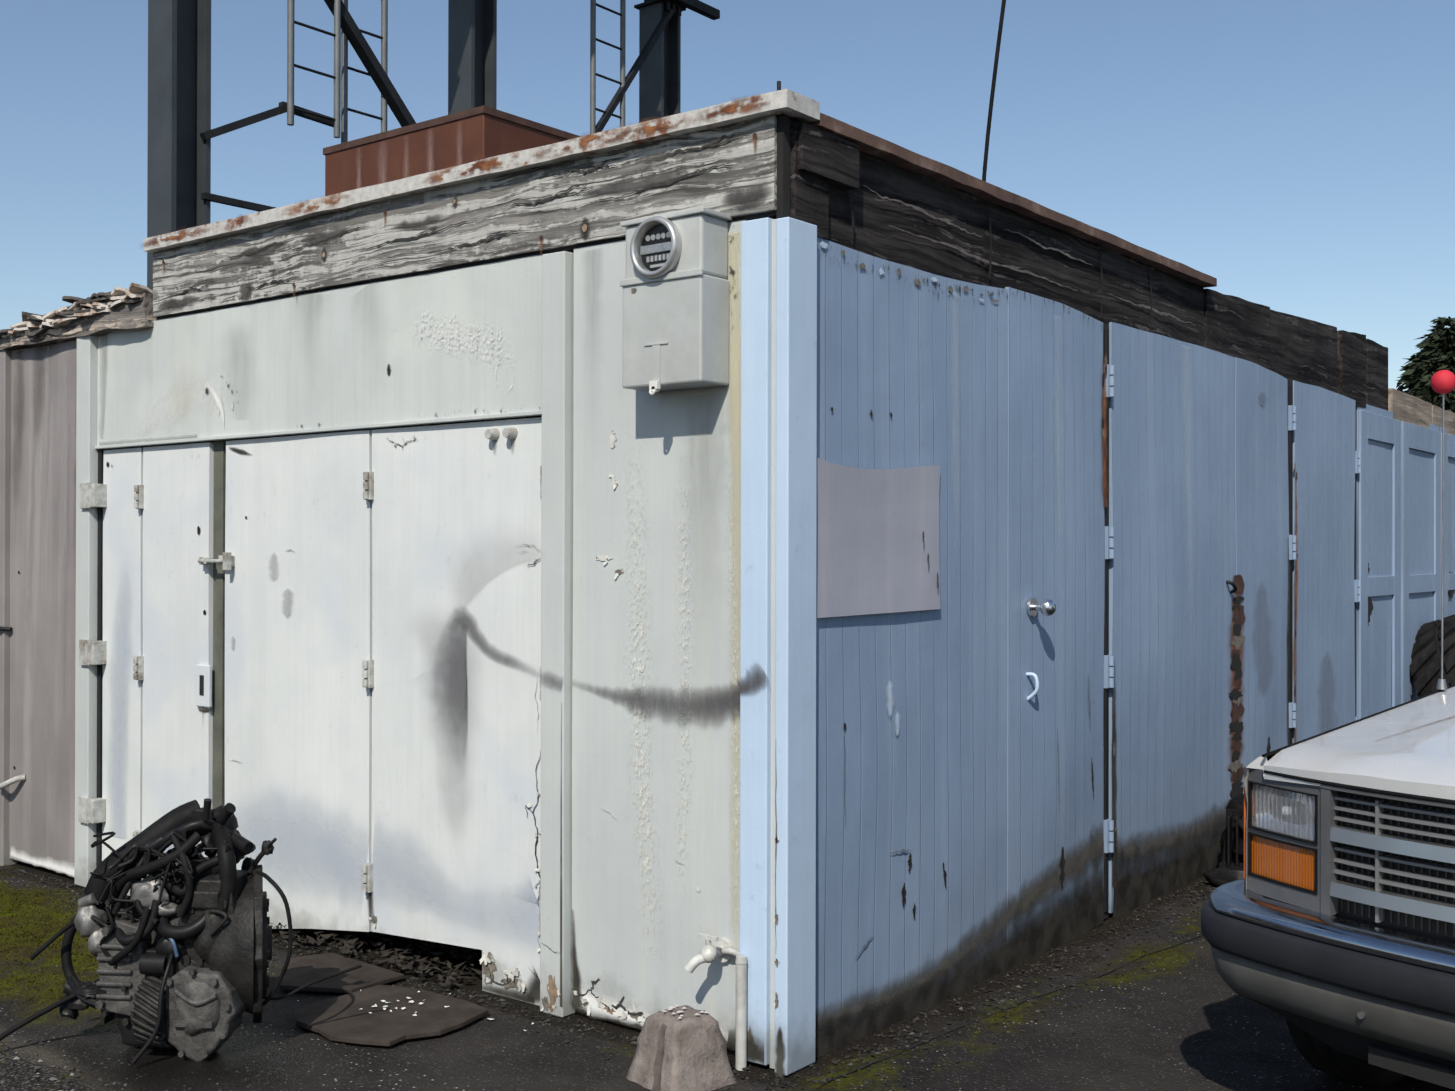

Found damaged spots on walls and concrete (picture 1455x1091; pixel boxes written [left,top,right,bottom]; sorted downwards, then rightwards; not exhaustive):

rust [707,99,764,119]
rust [554,120,672,152]
rust [429,156,517,182]
crack [525,678,558,953]
water stain [815,805,1227,1060]
peeling [479,952,525,992]
peeling [541,975,659,1026]